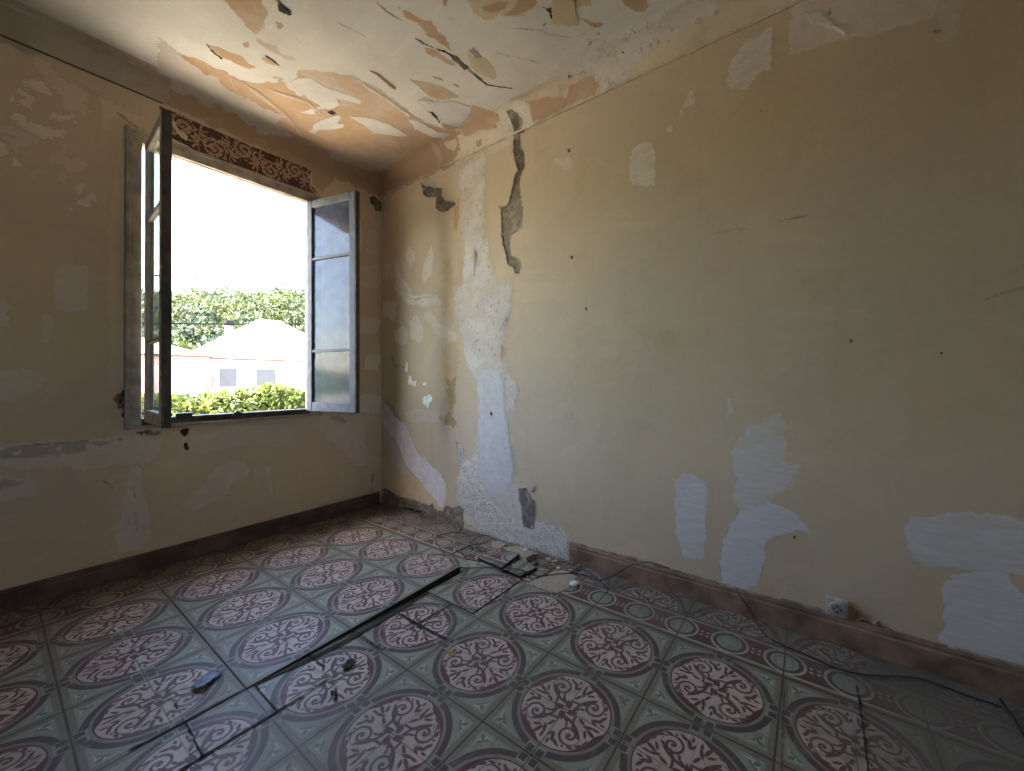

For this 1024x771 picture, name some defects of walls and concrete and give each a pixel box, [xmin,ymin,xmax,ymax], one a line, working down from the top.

peeling [466,0,603,47]
peeling [621,0,650,13]
peeling [154,0,501,212]
peeling [509,75,600,124]
crack [376,2,550,275]